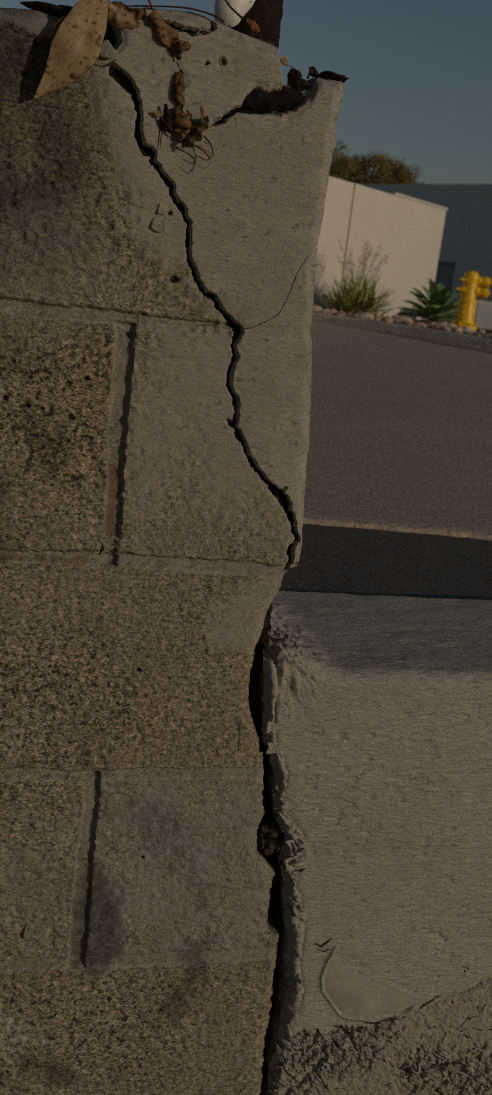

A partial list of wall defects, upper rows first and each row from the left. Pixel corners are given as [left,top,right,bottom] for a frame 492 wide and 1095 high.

crack [93,59,308,565]
crack [237,603,332,1094]
crack [292,996,492,1095]